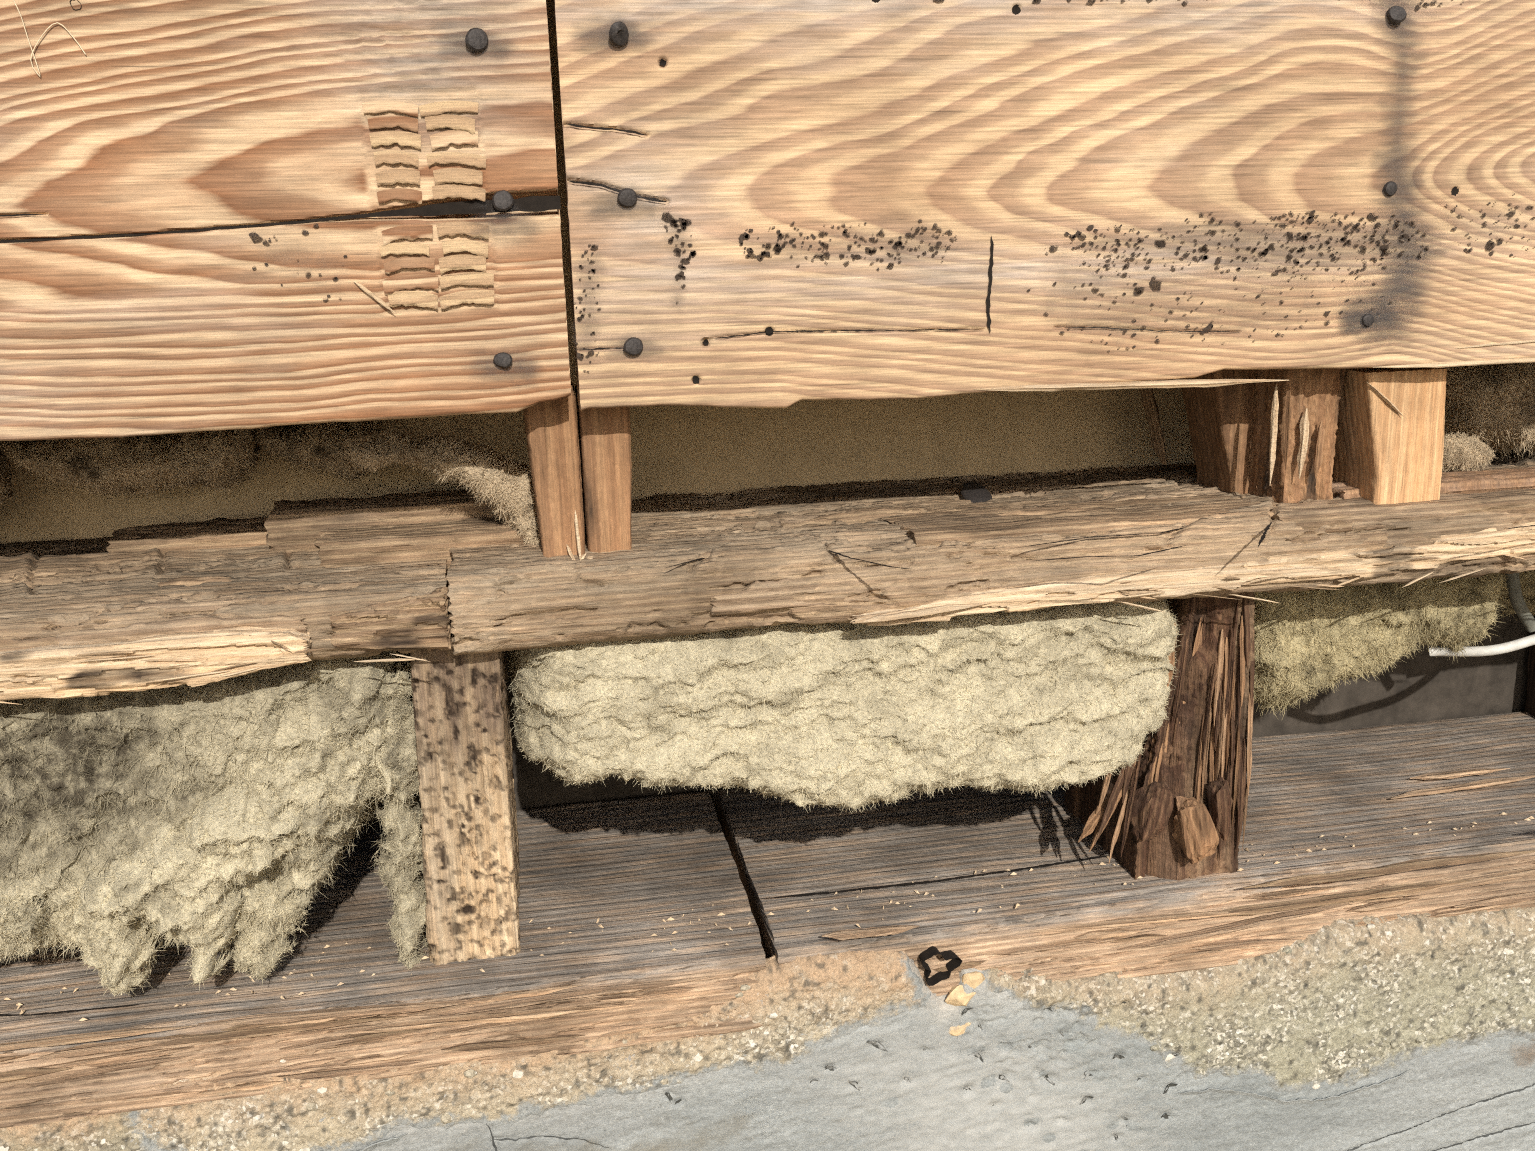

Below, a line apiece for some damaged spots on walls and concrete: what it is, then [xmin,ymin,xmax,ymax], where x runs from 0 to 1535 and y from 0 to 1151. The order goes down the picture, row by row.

damp [1389,0,1442,36]
mould [662,212,696,303]
mould [739,219,957,270]
damp [1045,147,1429,351]
damp [1446,193,1535,257]
spalling [962,907,1535,1105]
spalling [0,950,931,1151]
crack [486,1124,611,1151]
crack [1347,1084,1535,1151]